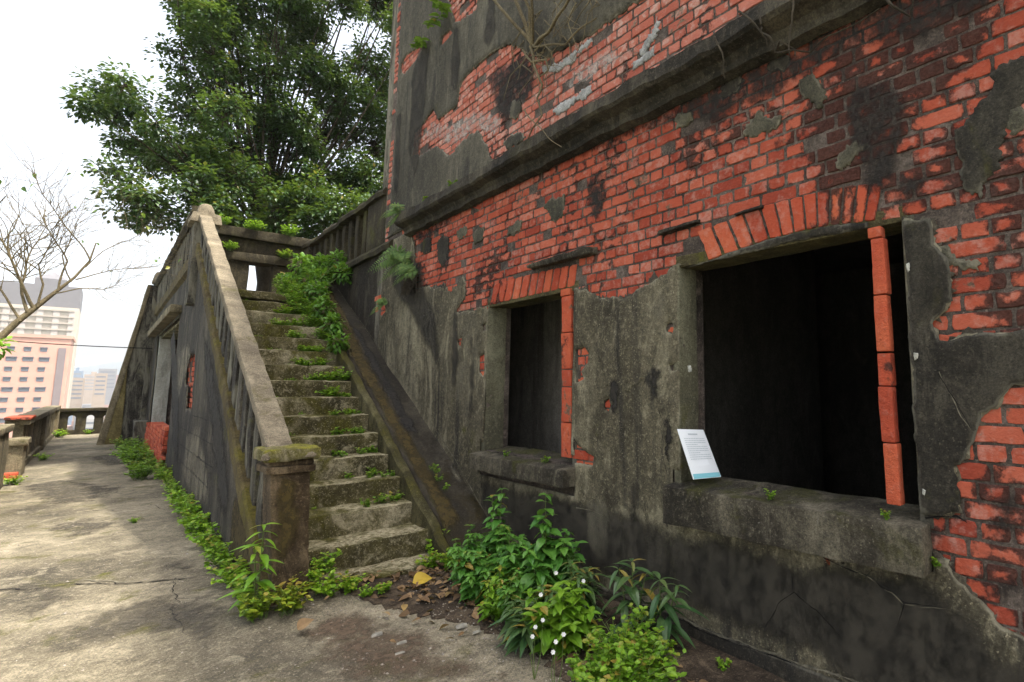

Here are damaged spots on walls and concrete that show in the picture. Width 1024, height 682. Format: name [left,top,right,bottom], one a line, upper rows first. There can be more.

flaking render [402,0,1024,341]
flaking render [578,348,589,381]
damp [645,367,660,399]
damp [664,420,672,460]
flaking render [931,387,1024,636]
crack [822,557,952,623]